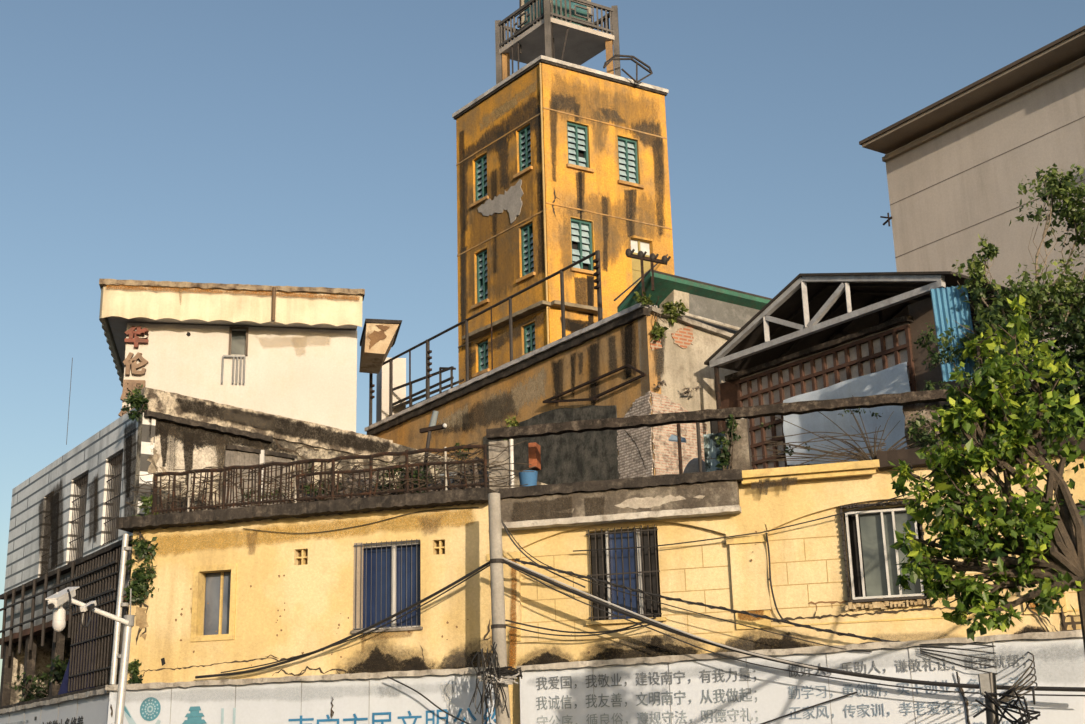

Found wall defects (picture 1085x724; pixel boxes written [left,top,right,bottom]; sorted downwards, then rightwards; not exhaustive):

peeling [478,179,524,224]
leakage [576,171,585,219]
leakage [601,109,665,237]
leakage [459,81,580,380]
leakage [560,276,594,333]
peeling [368,325,390,350]
flaking render [650,326,694,351]
leakage [436,323,636,433]
leakage [123,398,390,517]
peeling [614,495,705,509]
leakage [339,638,493,674]
leakage [507,635,701,666]